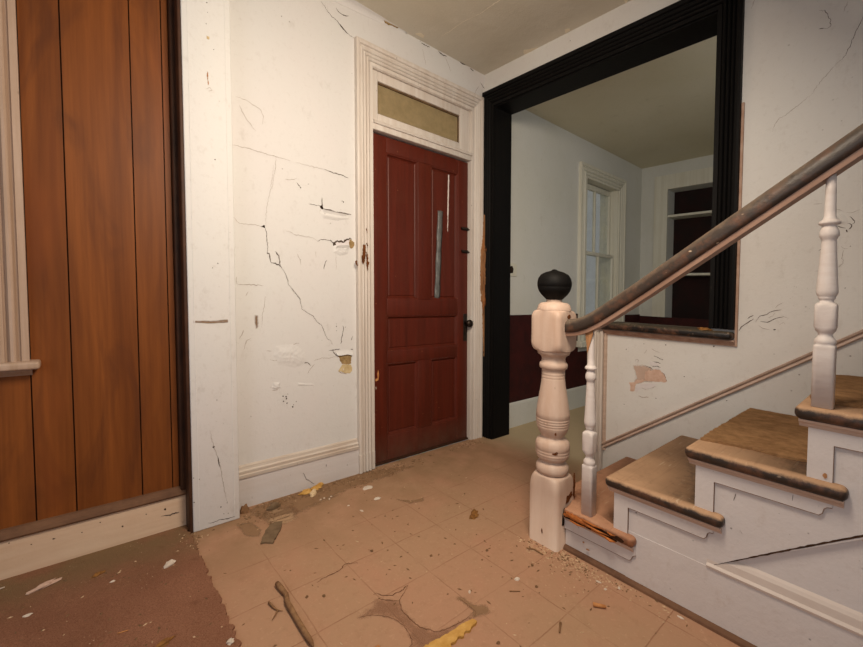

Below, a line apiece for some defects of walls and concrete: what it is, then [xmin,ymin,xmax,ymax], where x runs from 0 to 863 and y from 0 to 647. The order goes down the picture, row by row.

crack [236,97,351,342]
flaking render [291,232,369,271]
flaking render [317,339,353,374]
flaking render [629,350,667,398]
peeling [563,473,624,543]
crack [362,586,476,643]